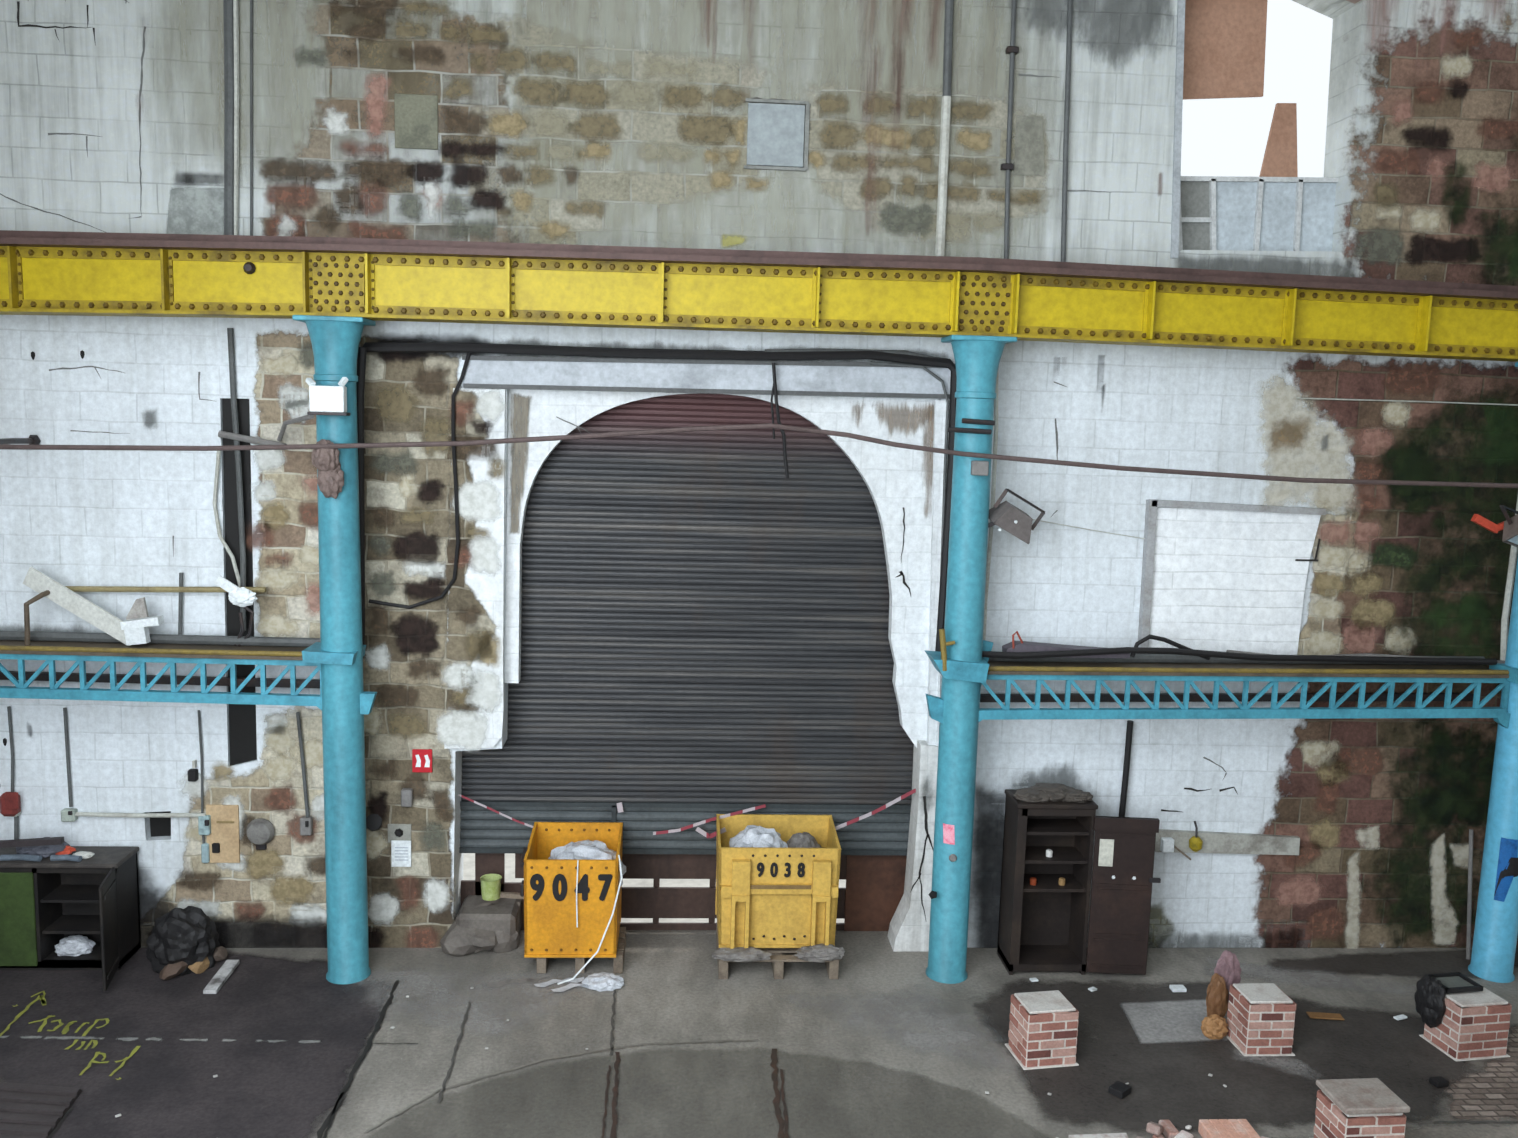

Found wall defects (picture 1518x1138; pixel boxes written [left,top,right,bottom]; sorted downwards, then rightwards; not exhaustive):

crack [0,0,146,232]
peeling [260,0,766,245]
peeling [808,84,1046,242]
leakage [1031,0,1169,61]
spalling [1341,9,1518,286]
peeling [249,330,320,638]
peeling [359,336,504,948]
spalling [1255,356,1518,948]
peeling [164,706,327,948]
crack [317,980,790,1138]